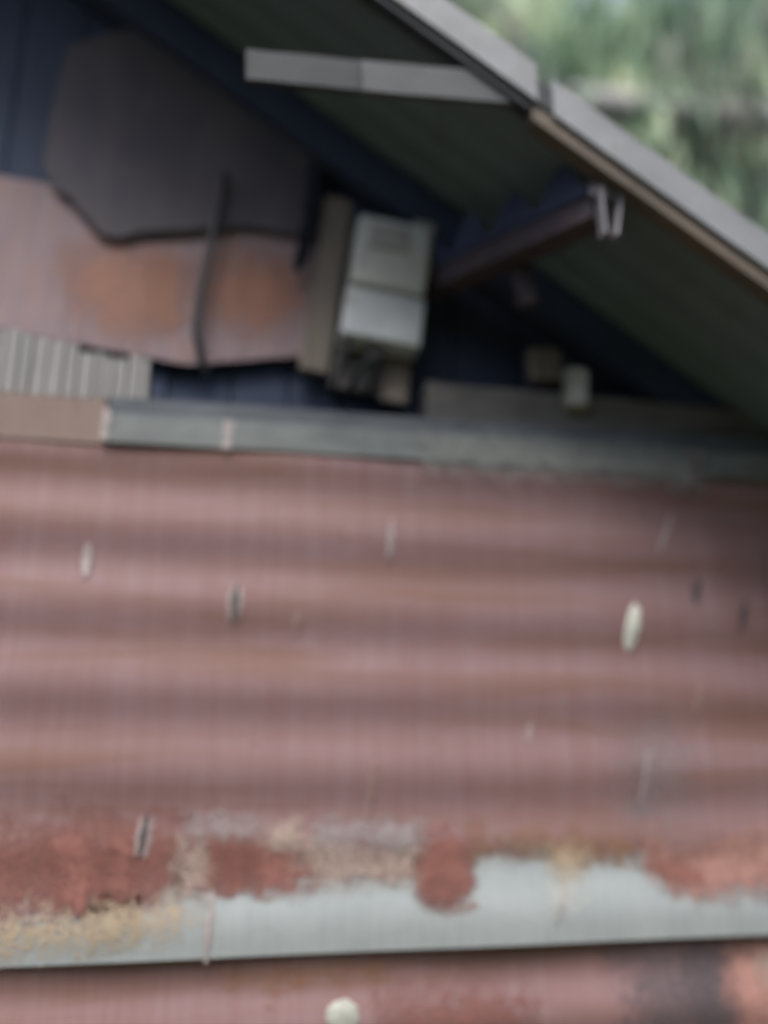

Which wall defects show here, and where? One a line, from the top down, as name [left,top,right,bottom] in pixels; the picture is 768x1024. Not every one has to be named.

peeling [0,833,768,967]